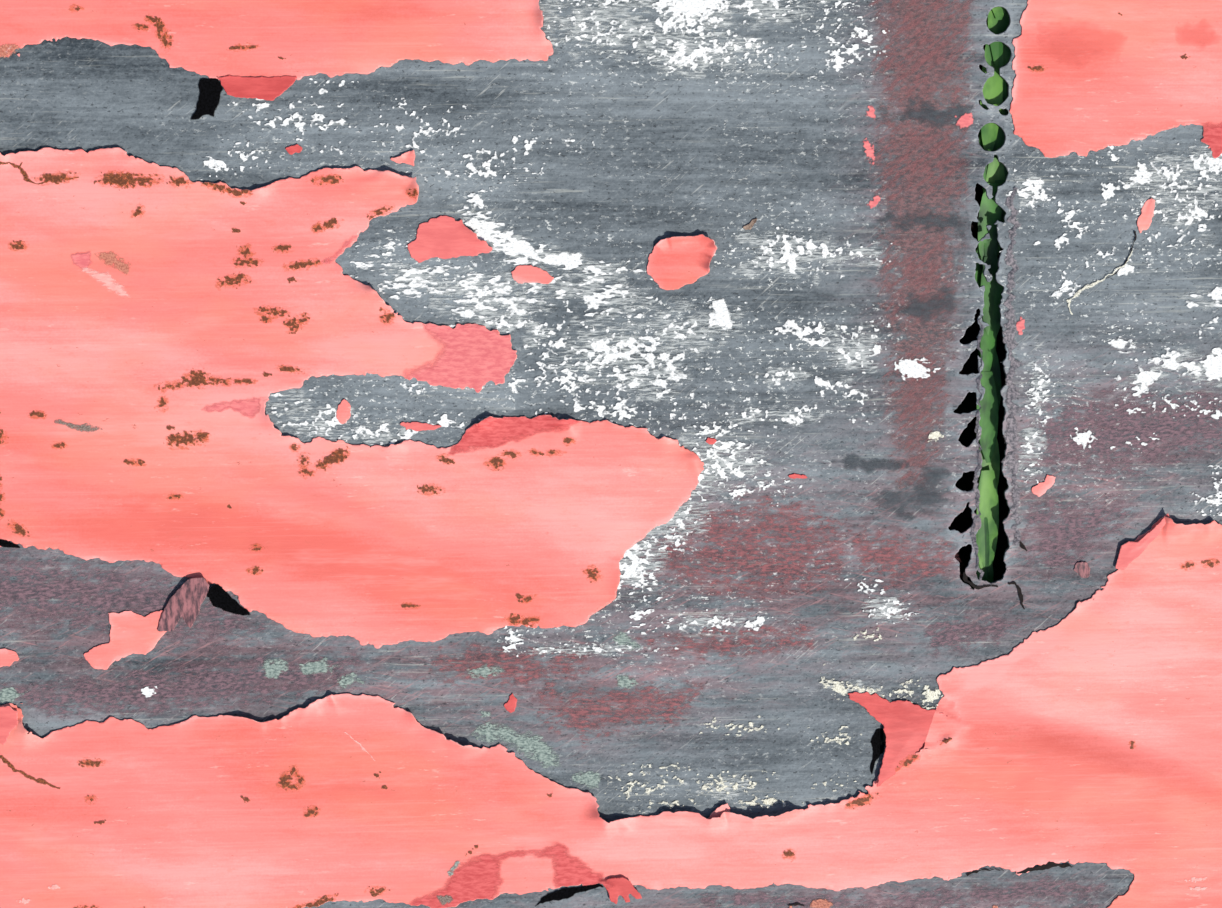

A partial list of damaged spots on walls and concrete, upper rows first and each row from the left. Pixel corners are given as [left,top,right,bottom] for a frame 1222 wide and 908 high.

peeling [0,0,553,80]
peeling [1009,0,1222,158]
corrosion [217,228,258,289]
peeling [647,234,717,290]
corrosion [258,307,310,334]
corrosion [158,365,300,407]
peeling [0,147,704,649]
corrosion [167,425,210,447]
corrosion [291,444,349,477]
peeling [936,516,1222,779]
crack [0,755,60,789]
peeling [0,693,1222,908]